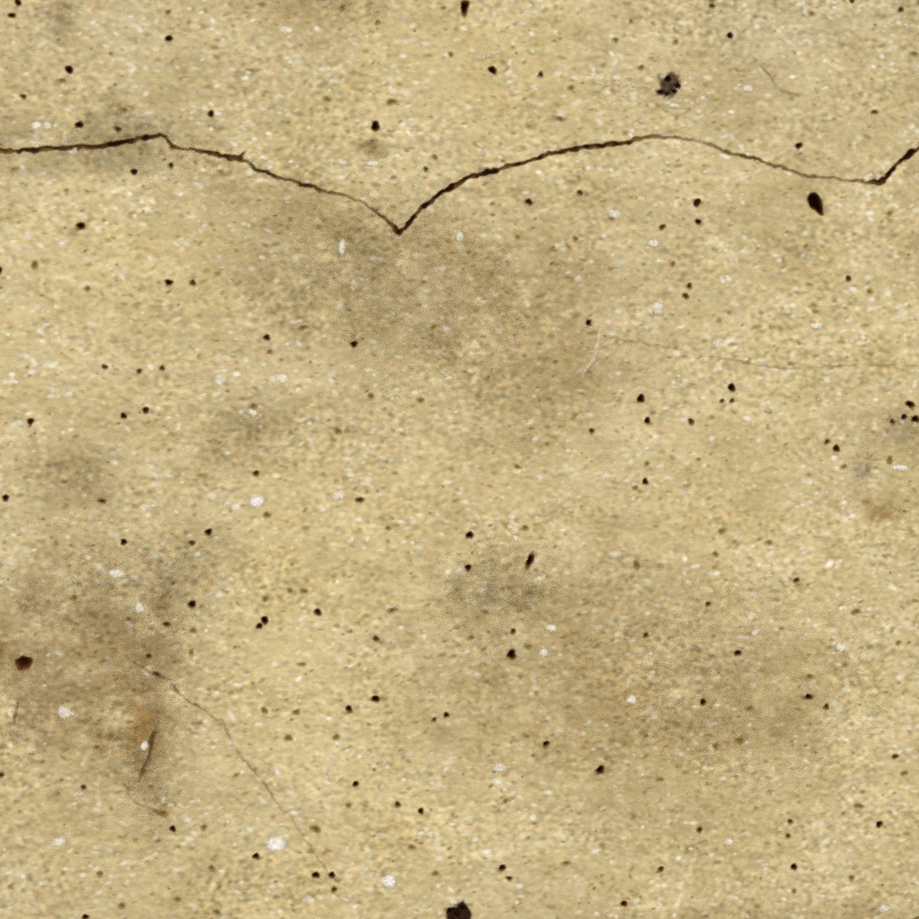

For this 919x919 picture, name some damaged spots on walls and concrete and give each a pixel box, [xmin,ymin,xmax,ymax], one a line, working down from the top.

crack [0,133,919,235]